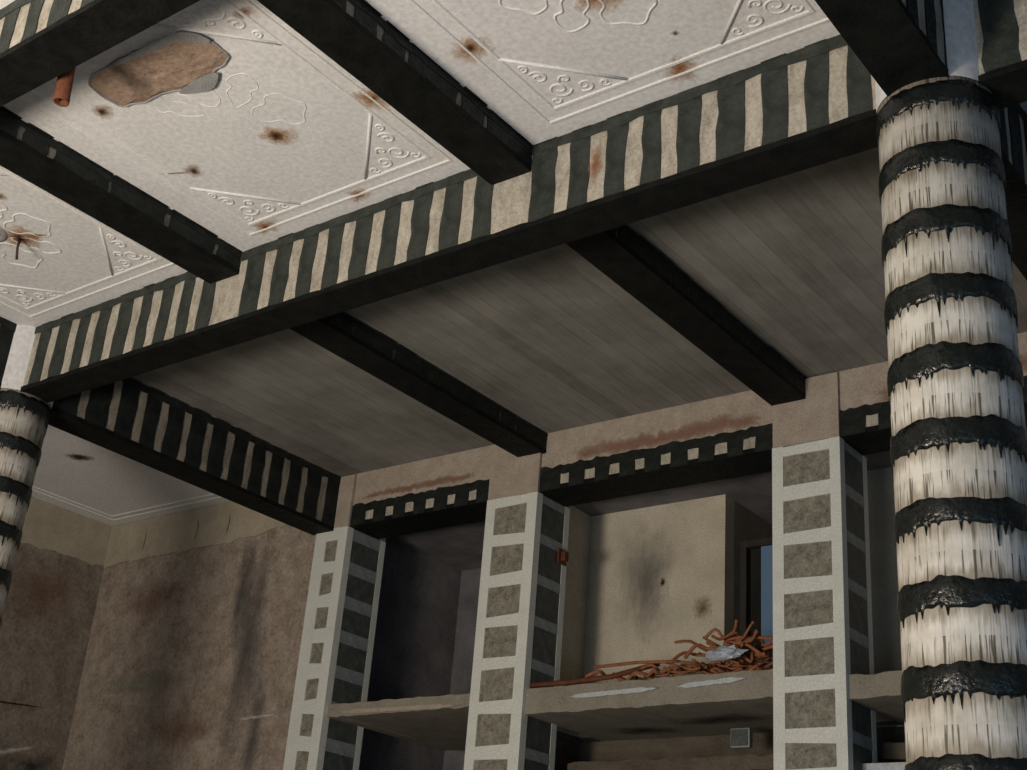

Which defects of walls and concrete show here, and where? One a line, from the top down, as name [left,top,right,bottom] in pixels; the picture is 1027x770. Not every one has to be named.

spalling [88,30,230,108]
rust [264,128,289,142]
rust [7,230,46,244]